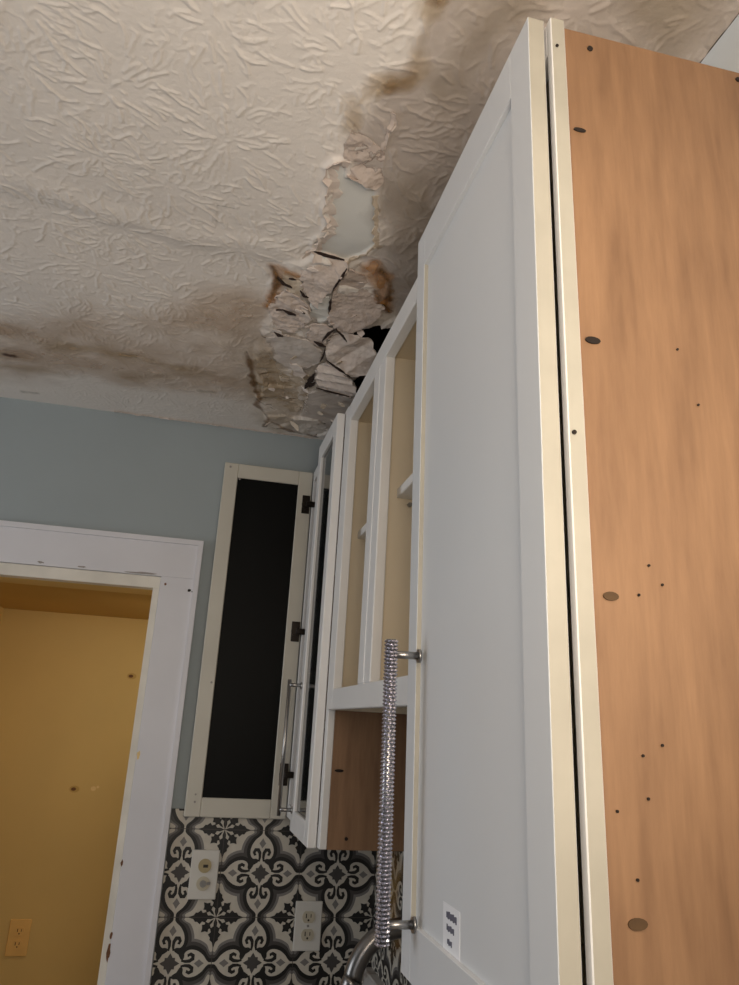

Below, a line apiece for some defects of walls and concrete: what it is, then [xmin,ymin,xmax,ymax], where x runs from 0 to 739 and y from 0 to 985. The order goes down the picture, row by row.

crack [274,251,350,397]
spalling [266,112,397,436]